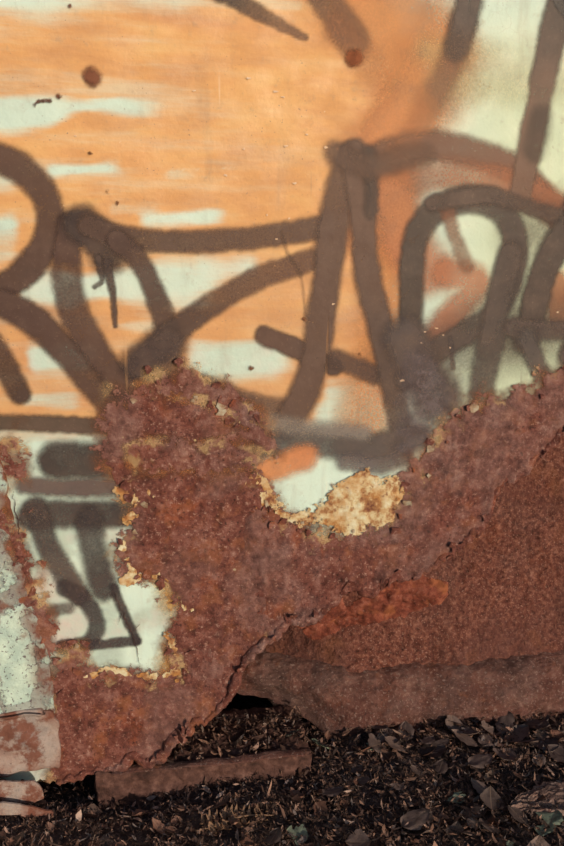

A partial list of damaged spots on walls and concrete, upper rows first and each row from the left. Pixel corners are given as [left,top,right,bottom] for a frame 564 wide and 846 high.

rust [0,356,564,784]
peeling [245,467,405,537]